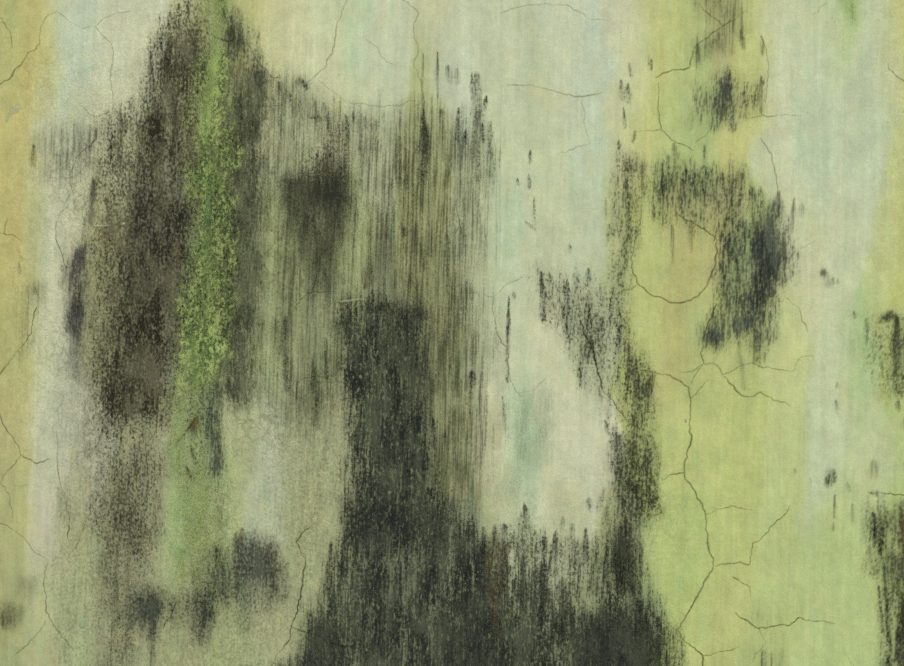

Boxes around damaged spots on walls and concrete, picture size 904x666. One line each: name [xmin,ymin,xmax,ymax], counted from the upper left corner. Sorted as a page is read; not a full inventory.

water stain [699,69,764,128]
water stain [65,0,285,666]
water stain [277,142,799,666]
crack [631,216,749,666]
water stain [865,310,904,405]
water stain [867,504,904,666]